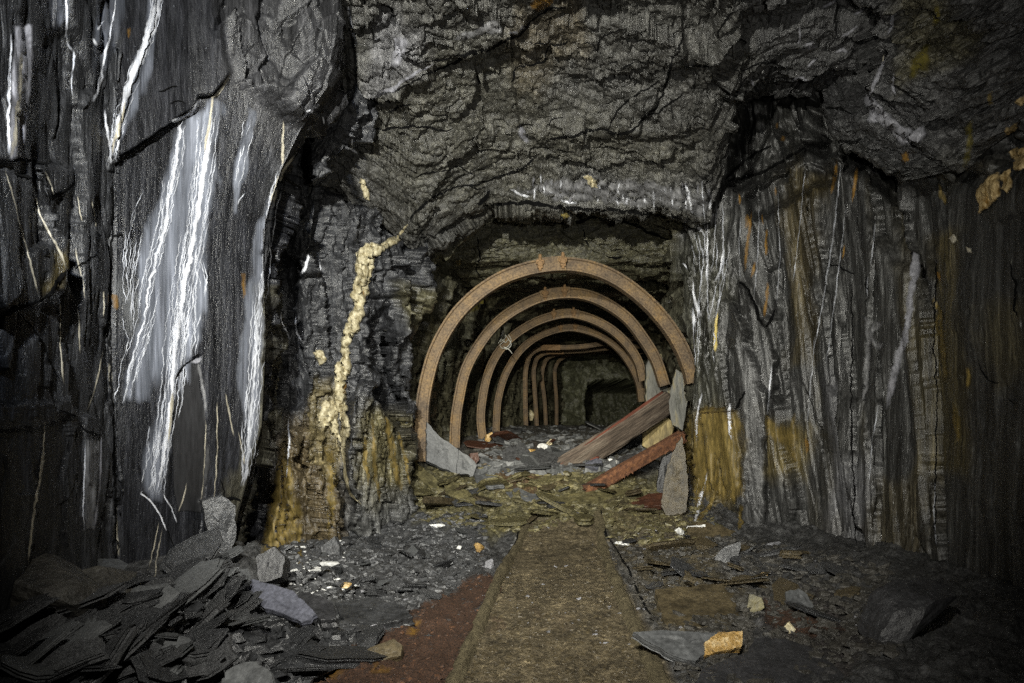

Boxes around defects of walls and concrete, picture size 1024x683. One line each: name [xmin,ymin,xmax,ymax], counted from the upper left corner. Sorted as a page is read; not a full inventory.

water stain [234,122,253,204]
crack [376,1,783,260]
crack [0,0,222,558]
water stain [114,75,230,529]
water stain [241,124,294,481]
water stain [887,252,920,405]
water stain [264,422,302,565]
water stain [326,453,338,529]
water stain [362,417,411,500]
water stain [684,395,744,528]
water stain [767,368,796,462]